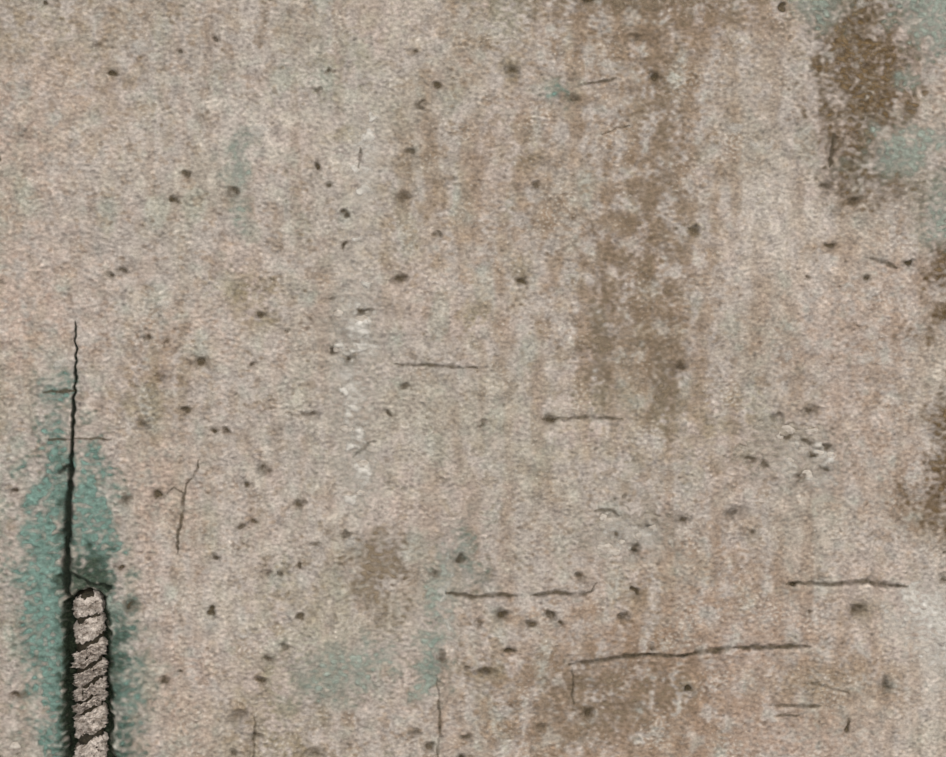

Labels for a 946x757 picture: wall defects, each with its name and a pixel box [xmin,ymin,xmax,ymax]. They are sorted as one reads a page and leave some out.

crack [44,321,112,595]
water stain [12,413,140,757]
crack [795,579,906,587]
spalling [62,588,115,757]
crack [569,644,799,703]